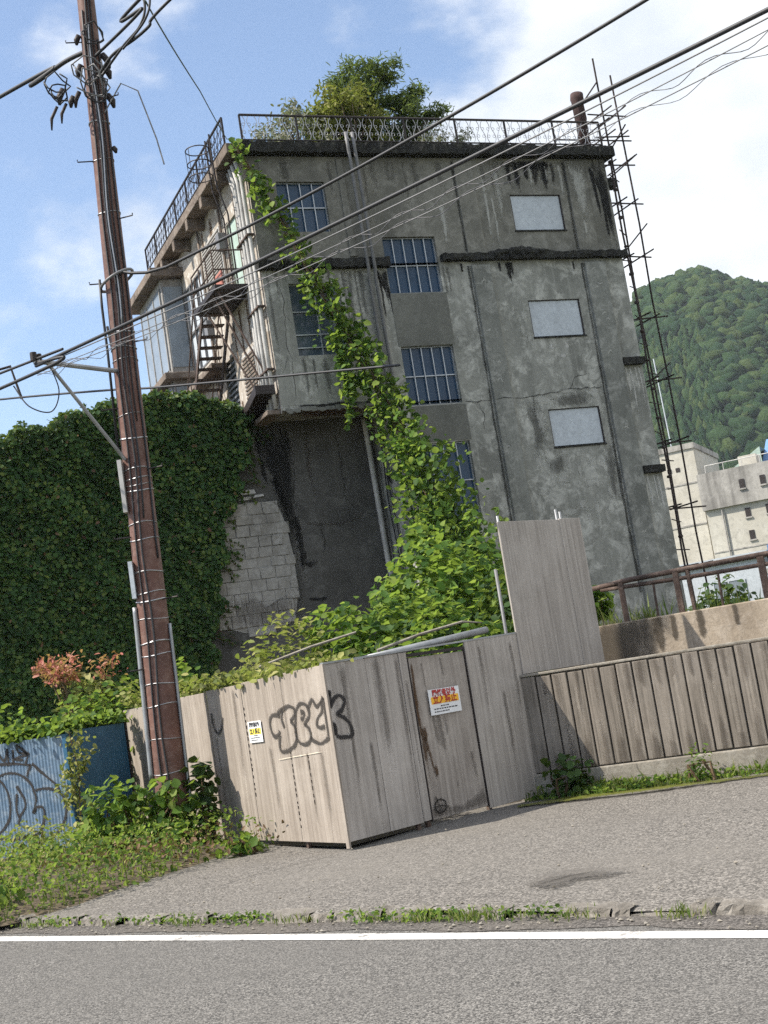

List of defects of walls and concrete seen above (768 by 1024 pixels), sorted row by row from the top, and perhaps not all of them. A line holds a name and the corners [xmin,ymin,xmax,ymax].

leakage [482,161,578,247]
leakage [588,165,614,235]
crack [466,375,602,429]
leakage [546,615,678,673]
leakage [696,610,706,636]
corrosion [411,665,438,776]